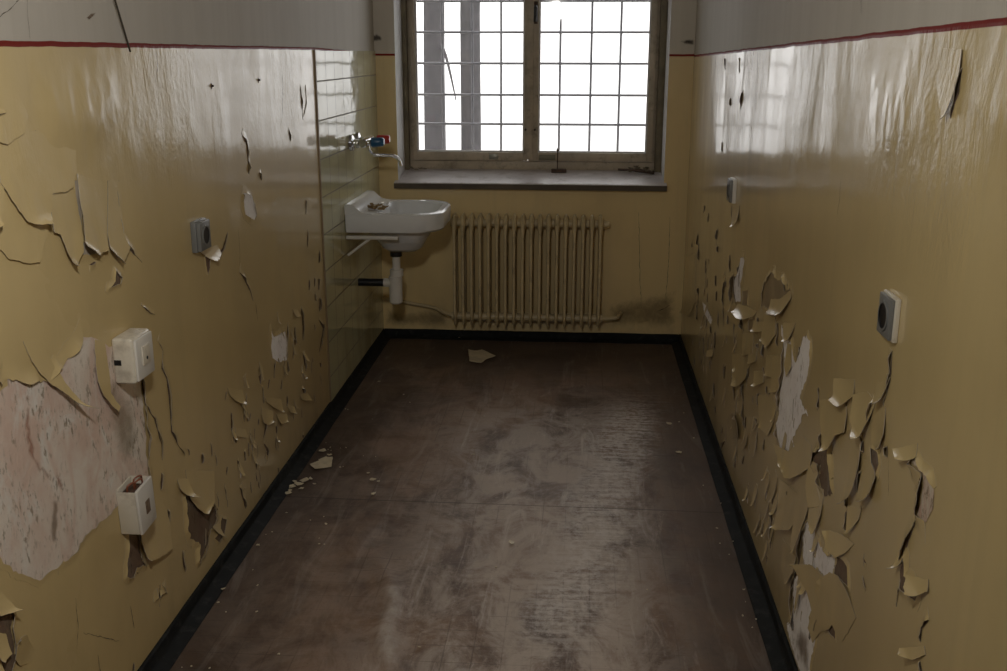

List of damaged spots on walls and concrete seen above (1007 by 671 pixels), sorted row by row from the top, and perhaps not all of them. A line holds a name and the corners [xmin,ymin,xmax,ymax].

peeling [937,48,962,119]
peeling [242,129,262,180]
peeling [201,232,229,272]
peeling [225,306,312,463]
peeling [0,318,240,588]
peeling [310,456,333,469]
peeling [702,229,937,671]
peeling [0,592,35,671]